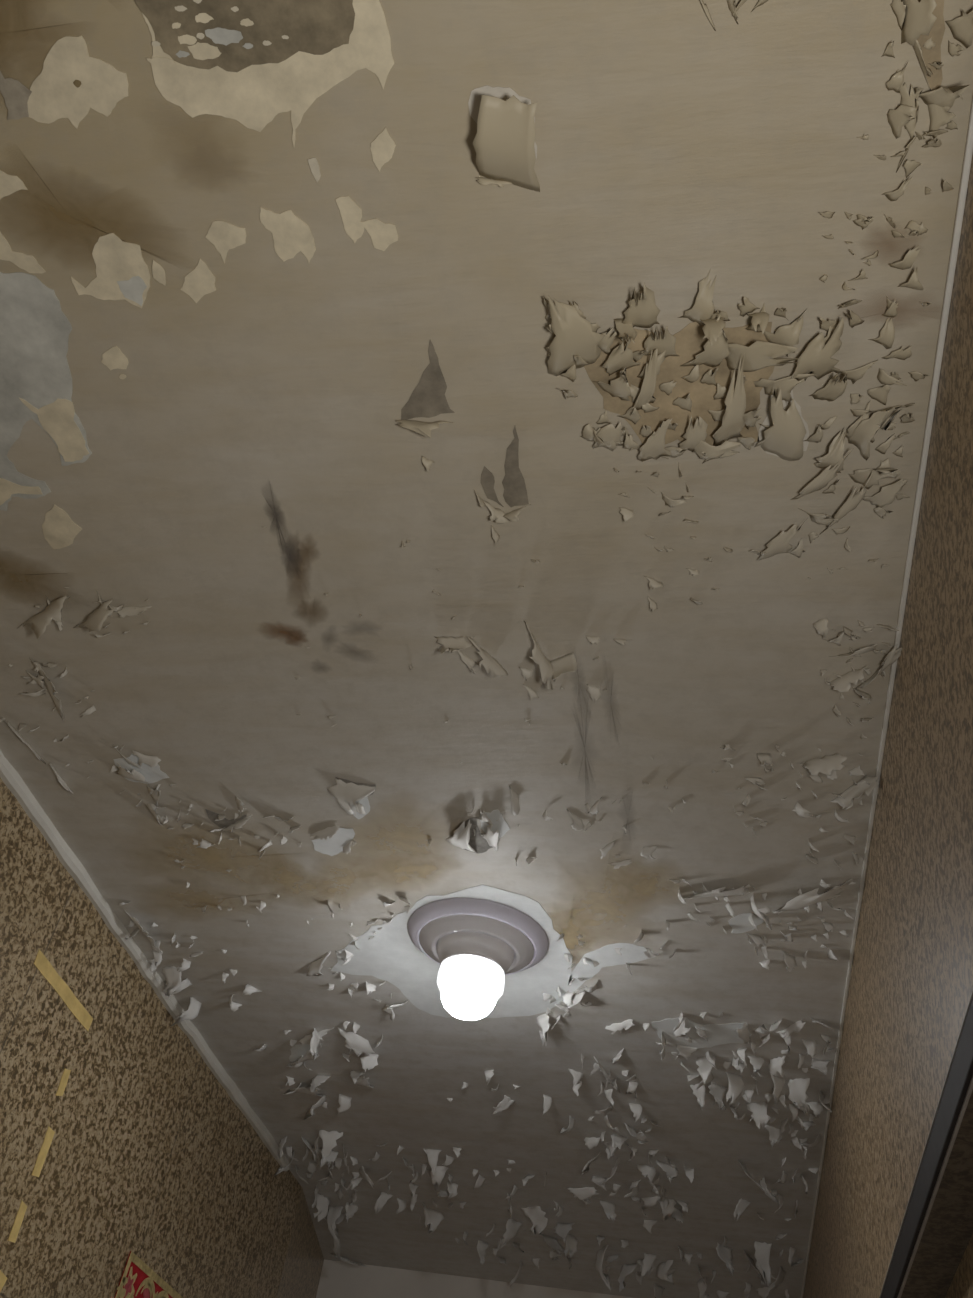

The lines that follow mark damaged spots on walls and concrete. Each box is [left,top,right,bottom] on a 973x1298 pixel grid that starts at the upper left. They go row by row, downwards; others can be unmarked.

peeling [543,0,973,560]
peeling [396,340,455,438]
peeling [474,427,531,545]
peeling [110,744,376,859]
peeling [428,786,520,854]
peeling [668,618,902,972]
peeling [118,902,203,1026]
peeling [222,969,262,1013]
peeling [307,885,676,1046]
peeling [283,1021,383,1120]
peeling [274,1130,466,1259]
peeling [454,1012,834,1298]